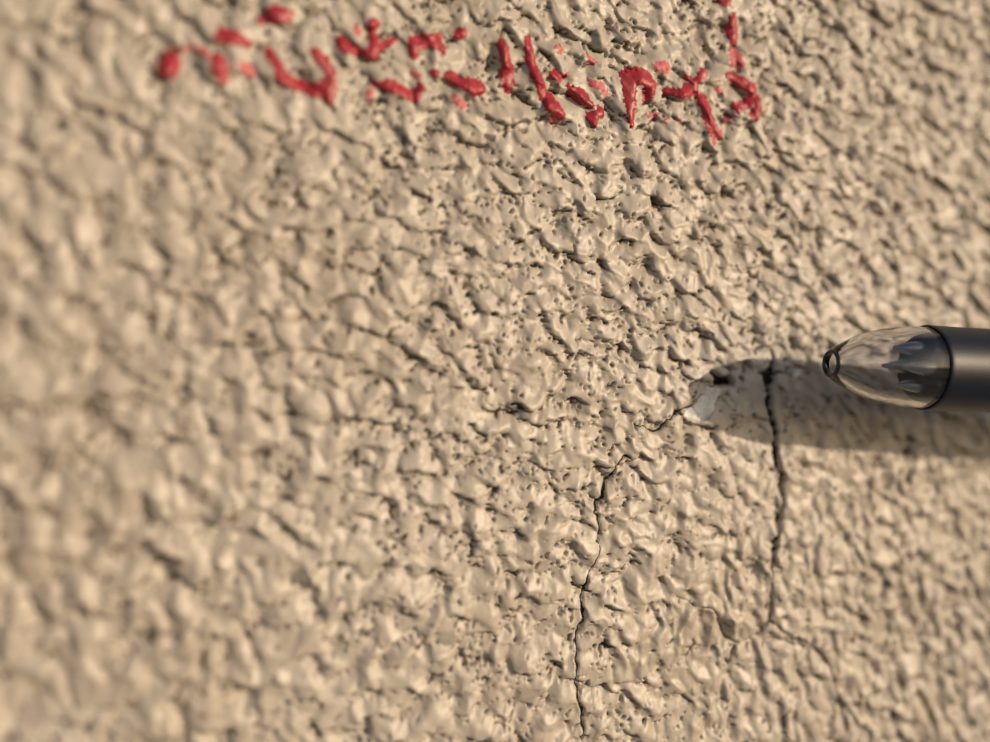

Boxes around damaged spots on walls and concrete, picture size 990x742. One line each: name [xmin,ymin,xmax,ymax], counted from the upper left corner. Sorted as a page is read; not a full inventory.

crack [573,455,632,742]
crack [633,377,714,432]
crack [676,351,847,732]